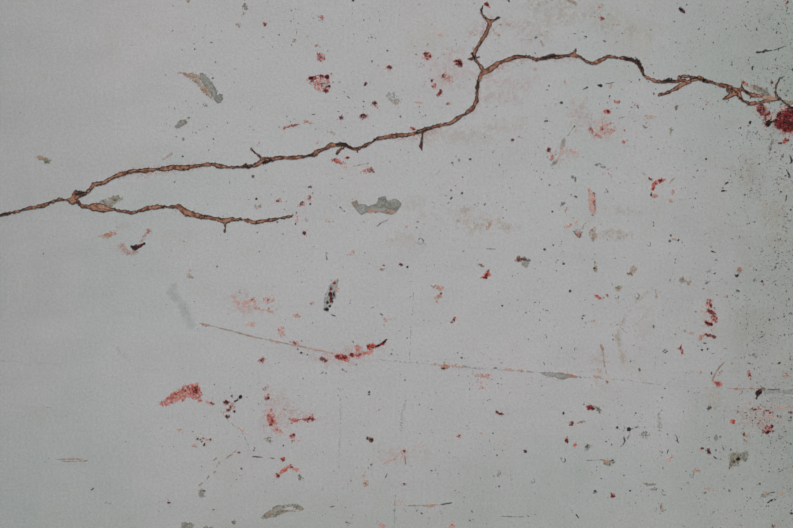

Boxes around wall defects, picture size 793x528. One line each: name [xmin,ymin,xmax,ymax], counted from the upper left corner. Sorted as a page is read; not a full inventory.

peeling [179,72,223,107]
crack [0,5,793,233]
corrosion [755,103,793,144]
peeling [352,196,401,225]